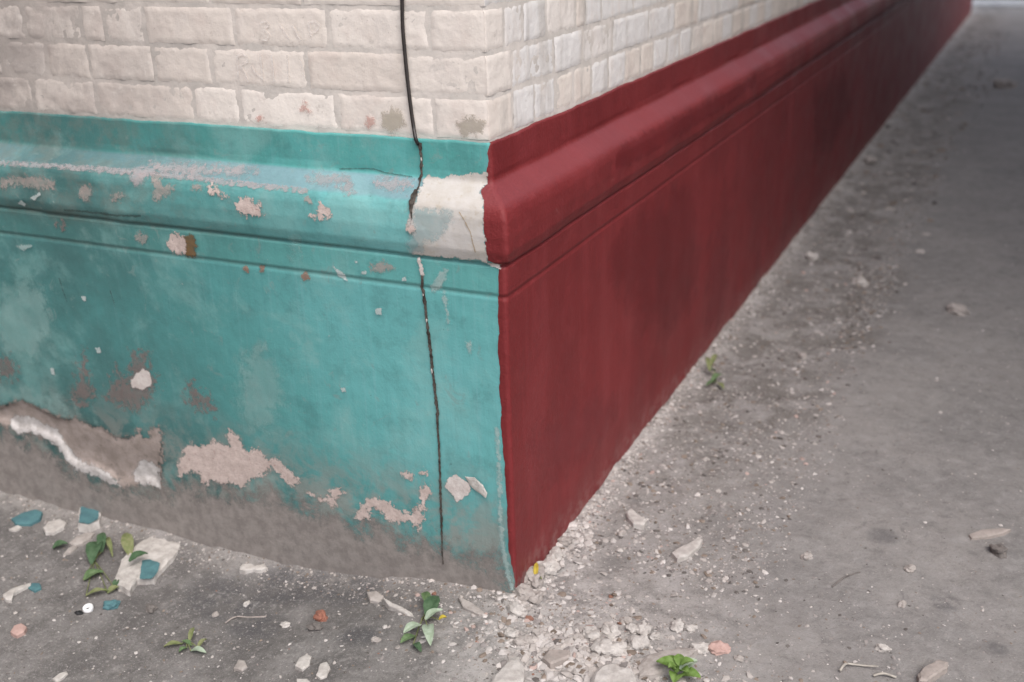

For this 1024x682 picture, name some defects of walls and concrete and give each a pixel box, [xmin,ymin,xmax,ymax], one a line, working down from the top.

peeling [0,160,355,222]
peeling [166,231,189,256]
peeling [355,259,406,281]
flaking render [373,172,501,323]
crack [405,143,444,564]
spalling [0,398,347,509]
damp [0,428,514,593]
peeling [354,470,433,532]